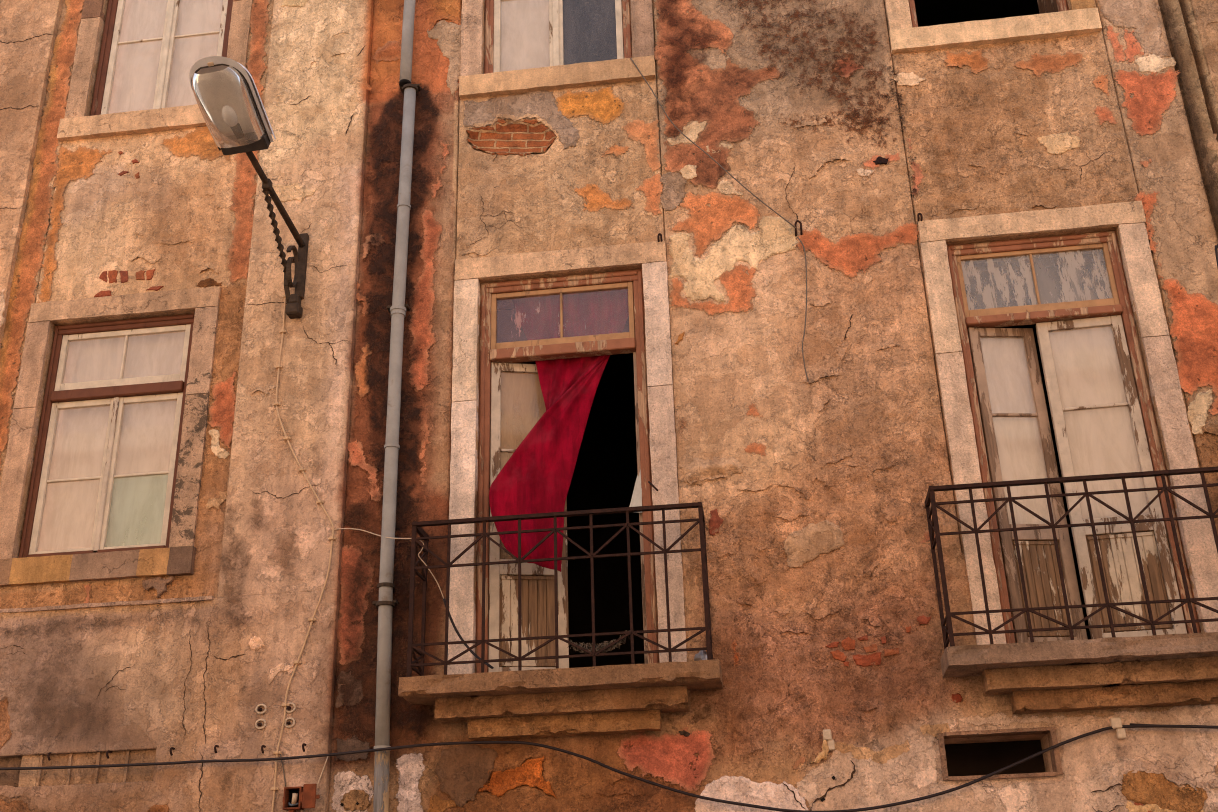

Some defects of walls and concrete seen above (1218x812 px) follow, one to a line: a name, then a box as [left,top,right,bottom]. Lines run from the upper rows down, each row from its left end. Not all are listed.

peeling [0,0,140,475]
flaking render [94,269,164,297]
flaking render [466,113,558,156]
peeling [552,0,926,315]
leakage [715,0,917,198]
peeling [1092,0,1180,136]
peeling [1135,191,1218,435]
leakage [339,85,439,737]
crack [182,620,245,812]
peeling [331,770,374,812]
flaking render [478,746,557,799]
peeling [608,704,1218,812]